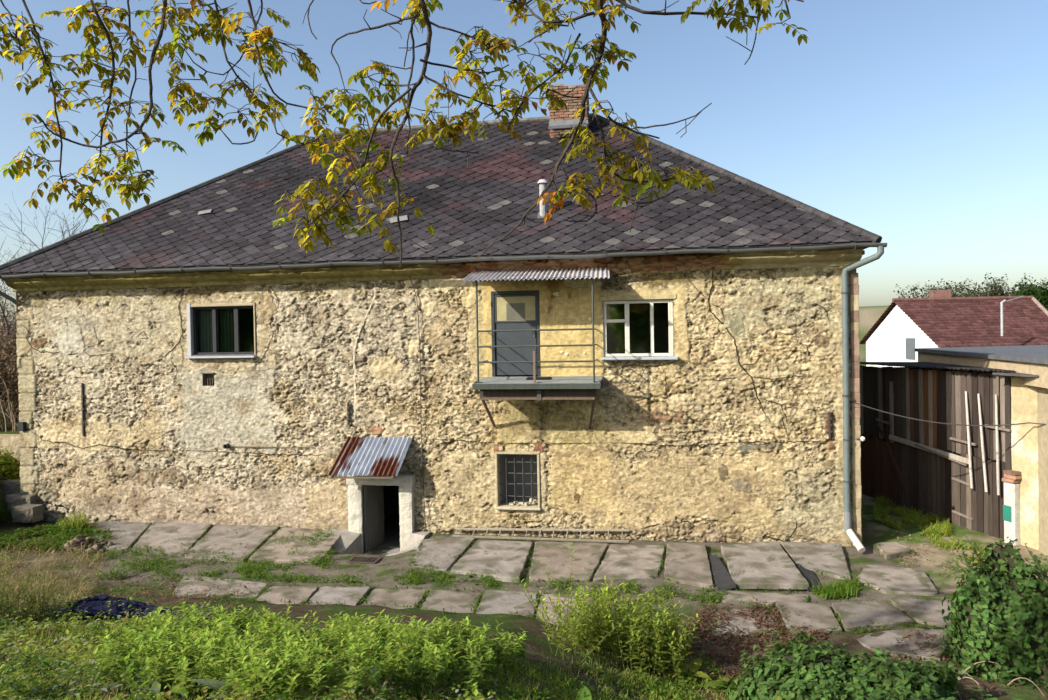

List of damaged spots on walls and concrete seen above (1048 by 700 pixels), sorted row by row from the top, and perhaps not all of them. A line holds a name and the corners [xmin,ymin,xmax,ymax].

crack [29,429,331,456]
crack [428,267,839,447]